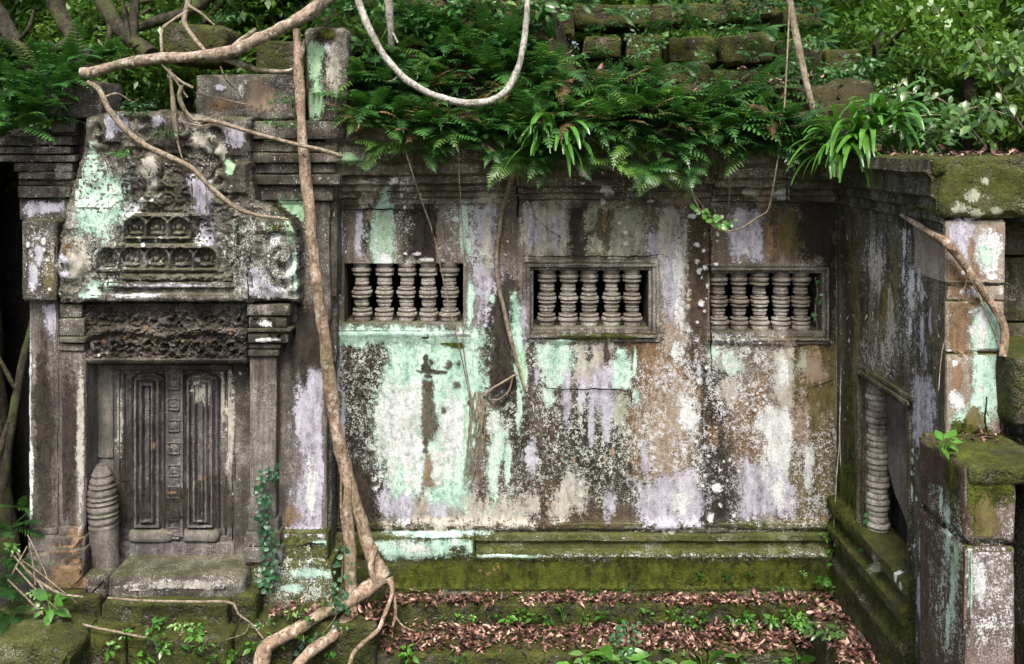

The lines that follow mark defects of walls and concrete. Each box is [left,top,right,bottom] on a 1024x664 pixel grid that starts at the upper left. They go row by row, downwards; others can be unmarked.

crack [546,388,632,403]
damp [337,192,972,664]